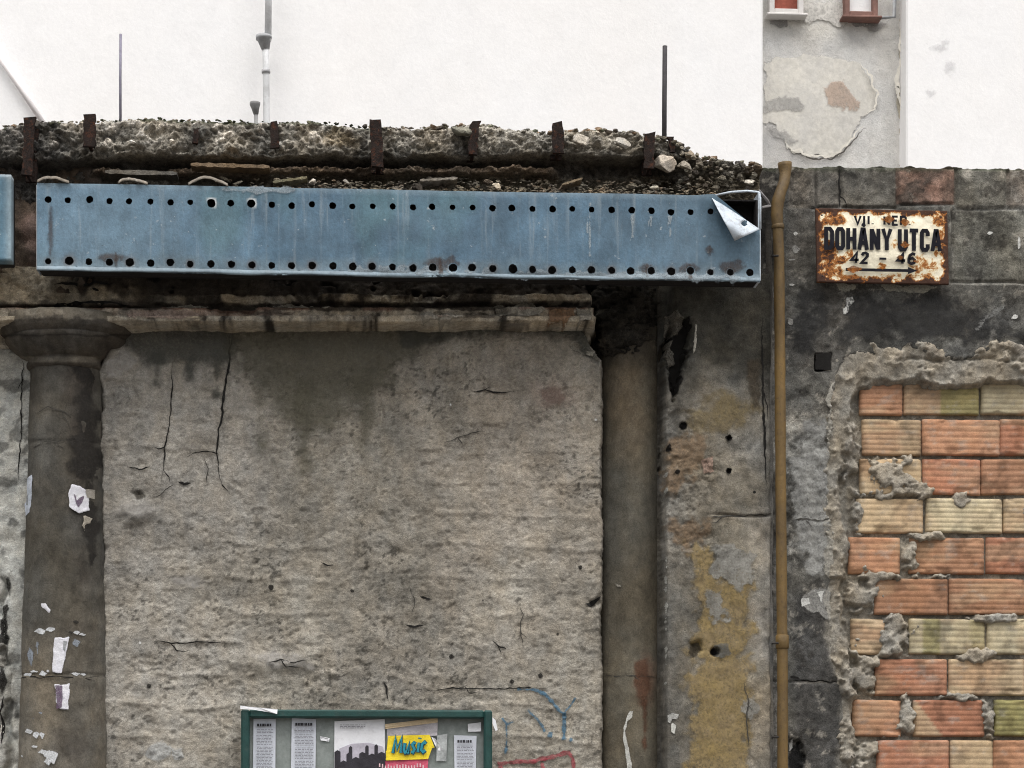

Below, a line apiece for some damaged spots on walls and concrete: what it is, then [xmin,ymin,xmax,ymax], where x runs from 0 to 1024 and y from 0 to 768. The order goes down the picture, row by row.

flaking render [763,53,879,160]
crack [17,361,75,480]
crack [129,333,233,497]
damp [125,329,512,471]
damp [527,330,595,358]
spalling [660,309,697,396]
spalling [814,353,835,468]
spalling [705,543,757,625]
crack [161,641,221,652]
spalling [689,643,731,658]